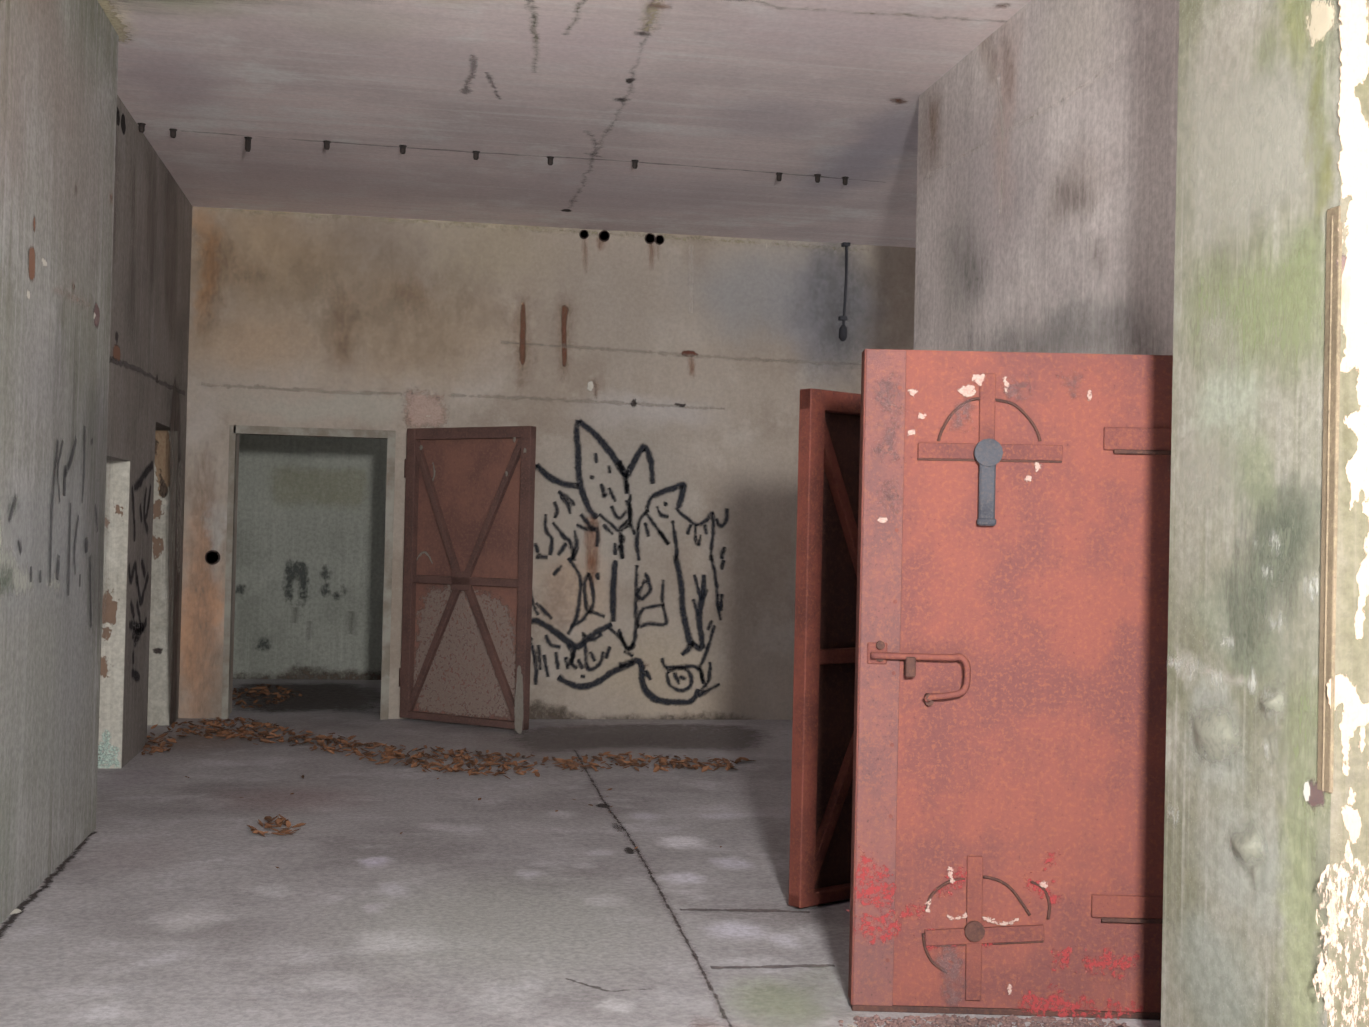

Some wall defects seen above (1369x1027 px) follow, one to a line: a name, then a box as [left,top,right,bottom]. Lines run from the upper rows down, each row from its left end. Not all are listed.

crack [462,55,501,99]
corrosion [561,305,569,367]
peeling [1306,0,1369,640]
peeling [100,589,119,678]
peeling [1313,674,1369,1027]